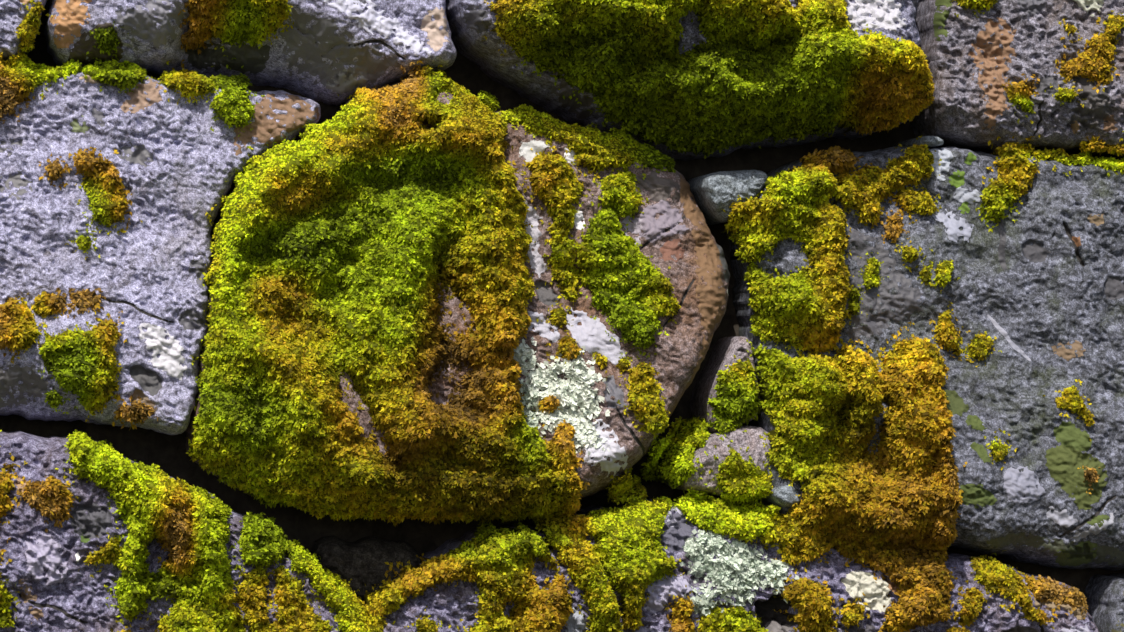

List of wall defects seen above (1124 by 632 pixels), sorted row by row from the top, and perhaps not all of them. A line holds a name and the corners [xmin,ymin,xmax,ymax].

crack [297,28,406,60]
crack [101,296,174,323]